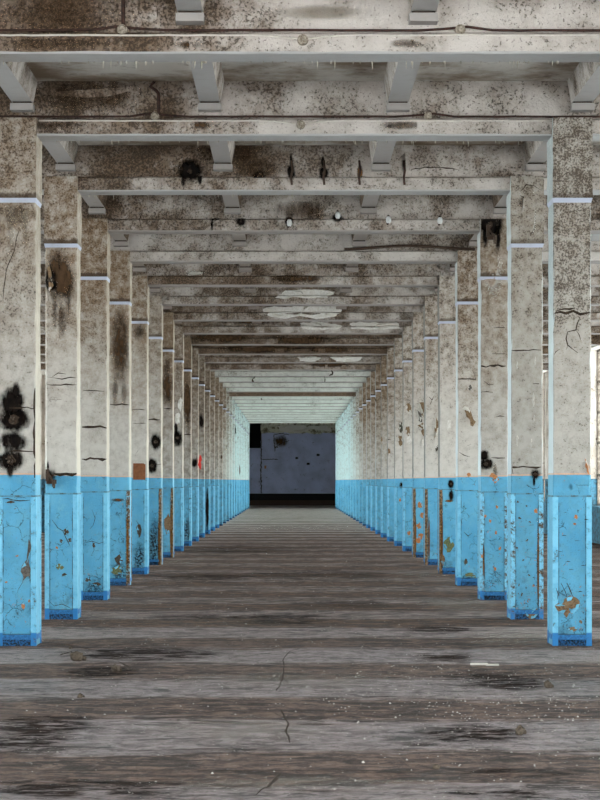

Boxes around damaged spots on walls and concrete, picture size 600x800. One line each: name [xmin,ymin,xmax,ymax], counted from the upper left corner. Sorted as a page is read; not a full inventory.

crack [3,229,20,296]
damp [49,252,74,331]
peeling [263,289,402,330]
crack [460,308,590,393]
crack [9,373,171,478]
peeling [462,406,476,426]
peeling [16,540,31,584]
peeling [441,537,454,565]
peeling [555,596,582,632]